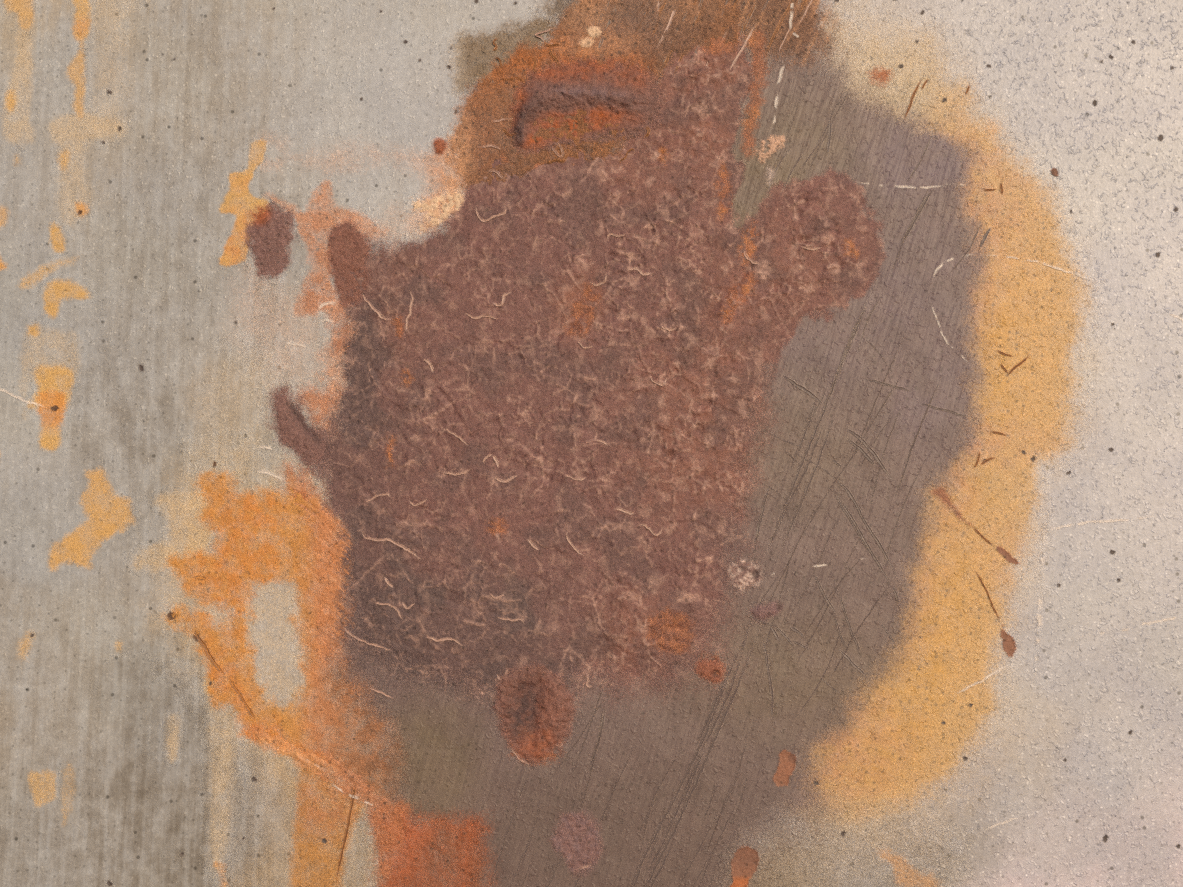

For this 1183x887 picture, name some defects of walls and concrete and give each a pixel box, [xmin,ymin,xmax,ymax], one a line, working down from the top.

corrosion [70,0,88,113]
leakage [451,0,583,91]
corrosion [45,282,86,316]
corrosion [168,0,1079,887]
corrosion [50,471,128,568]